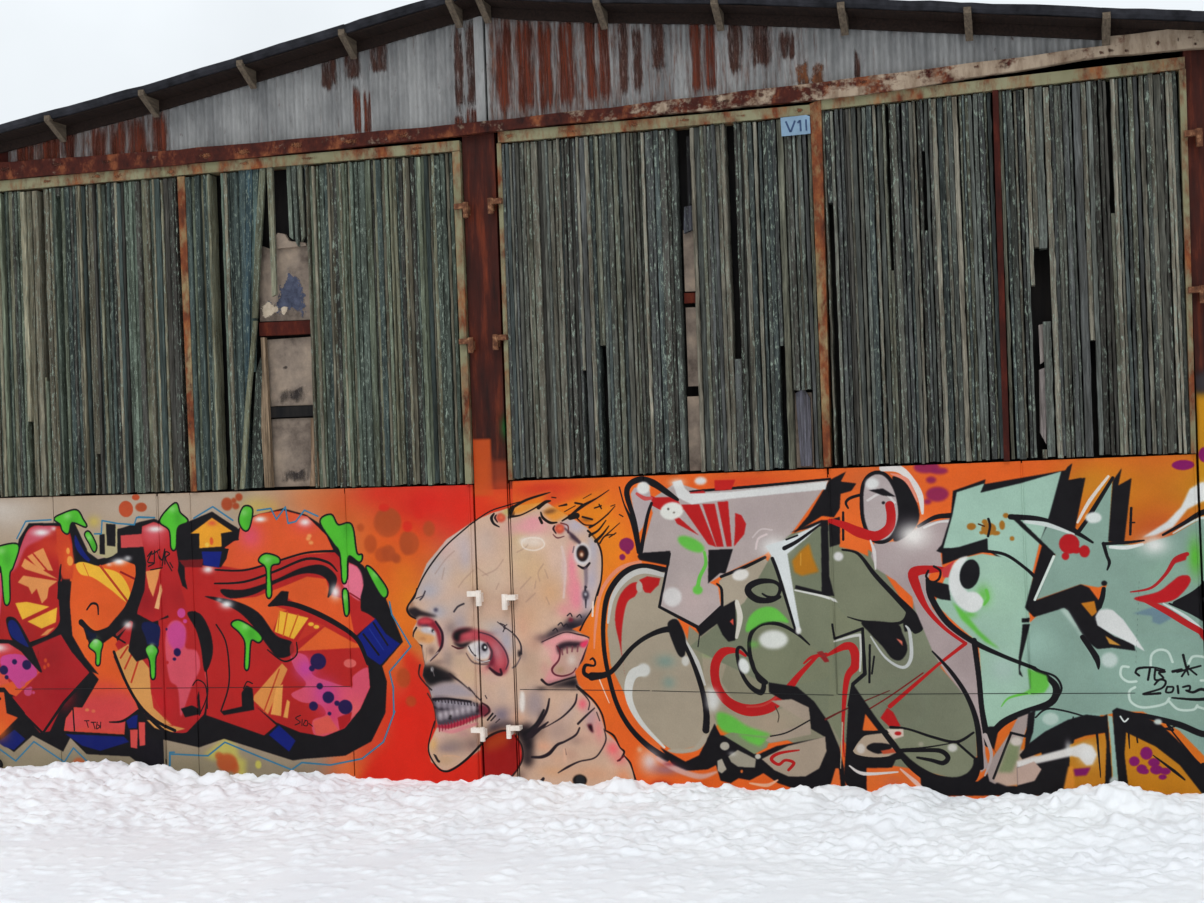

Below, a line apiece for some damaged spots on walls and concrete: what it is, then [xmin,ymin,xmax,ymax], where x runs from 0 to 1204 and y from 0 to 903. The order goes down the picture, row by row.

rust [454,20,477,124]
rust [496,20,665,113]
rust [689,24,824,95]
rust [2,135,75,171]
rust [92,114,167,178]
peeling [260,273,306,318]